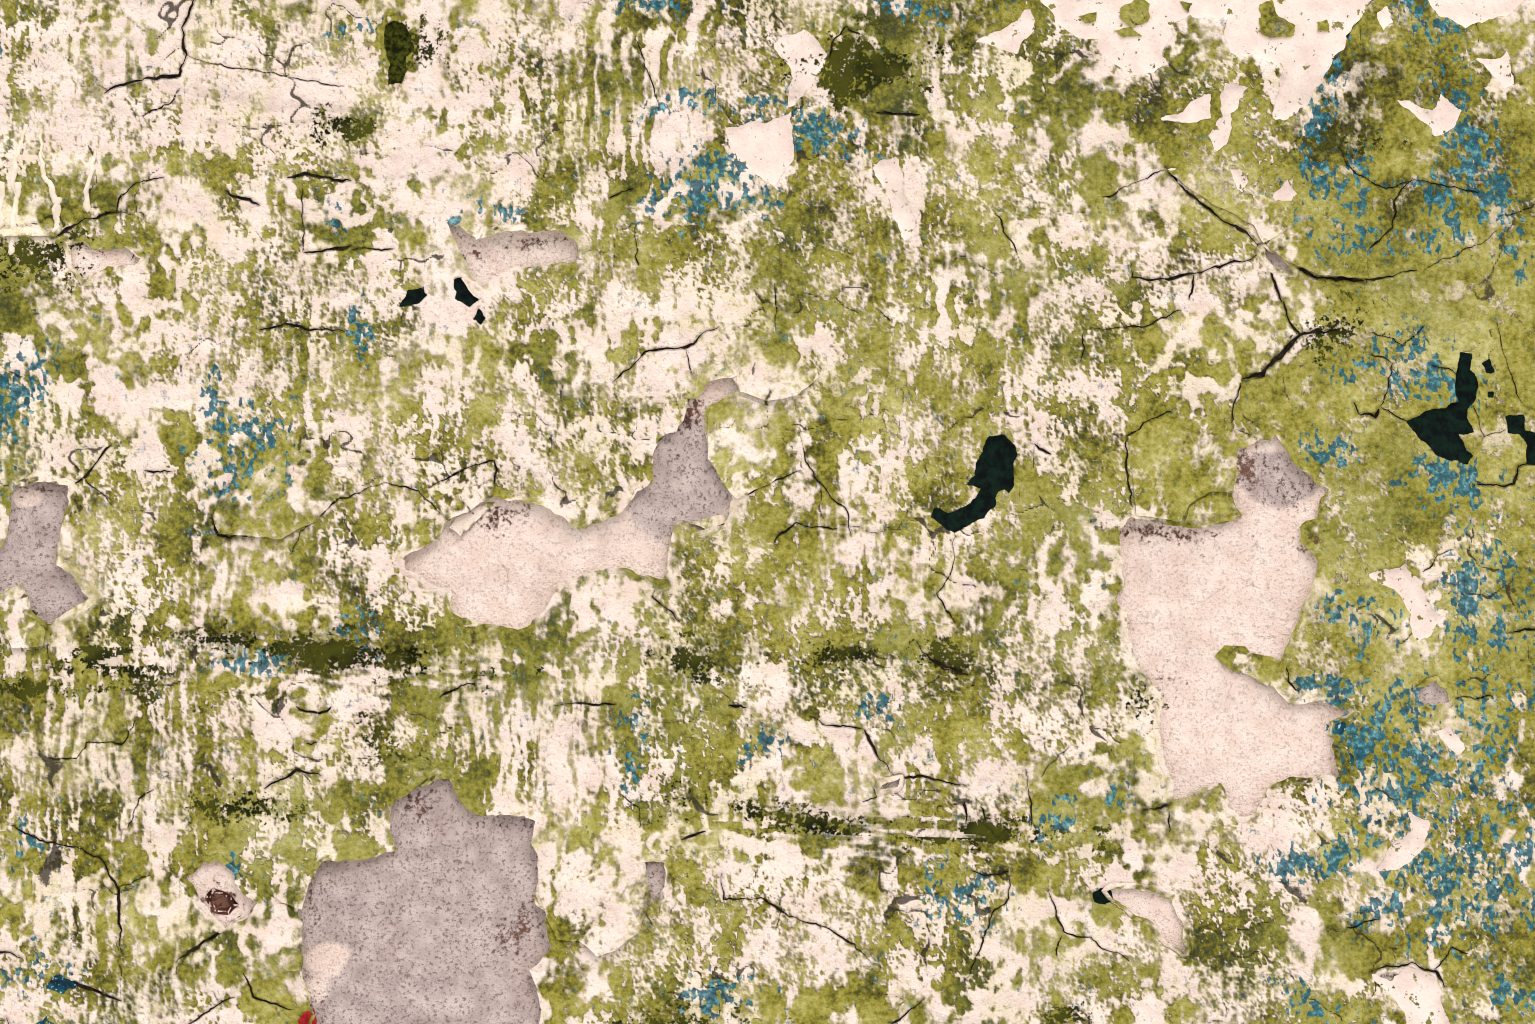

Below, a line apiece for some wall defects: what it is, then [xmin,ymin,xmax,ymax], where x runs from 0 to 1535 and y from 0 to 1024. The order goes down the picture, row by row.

peeling [976,0,1393,120]
peeling [438,213,600,325]
crack [1080,150,1535,437]
peeling [1407,352,1495,464]
peeling [390,332,818,645]
peeling [931,434,1017,533]
crack [1474,463,1530,488]
peeling [0,470,103,648]
peeling [1107,414,1358,824]
crack [176,909,252,962]
peeling [179,762,672,1024]
crack [189,973,292,1024]